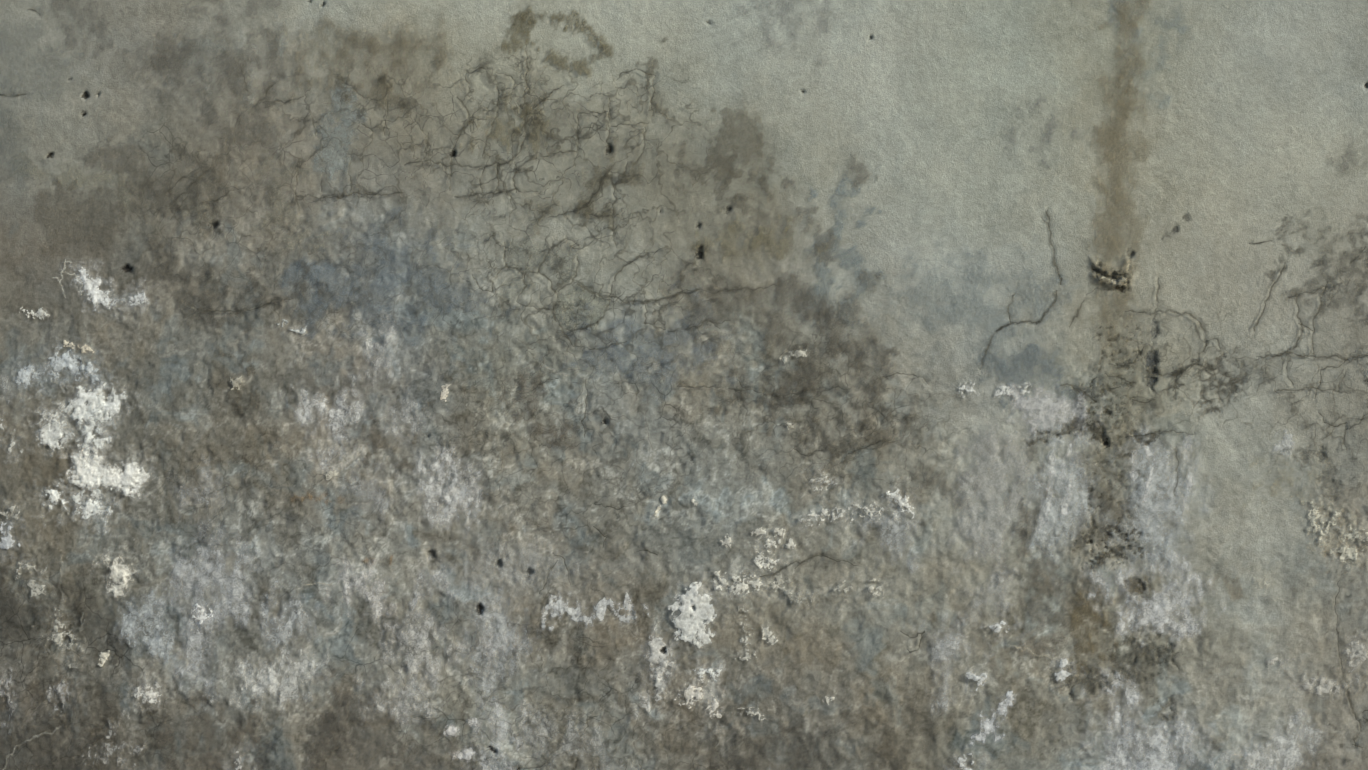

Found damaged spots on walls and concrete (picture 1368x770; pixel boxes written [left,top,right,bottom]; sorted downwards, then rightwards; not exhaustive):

crack [234,44,820,436]
crack [982,210,1096,364]
flaking render [1092,254,1132,292]
crack [1027,278,1221,495]
crack [1249,241,1368,450]
damp [908,262,1211,681]
damp [870,506,918,569]
damp [966,672,987,691]
damp [958,691,1014,770]
damp [1104,675,1194,770]
damp [1211,712,1319,770]
damp [1267,636,1368,695]